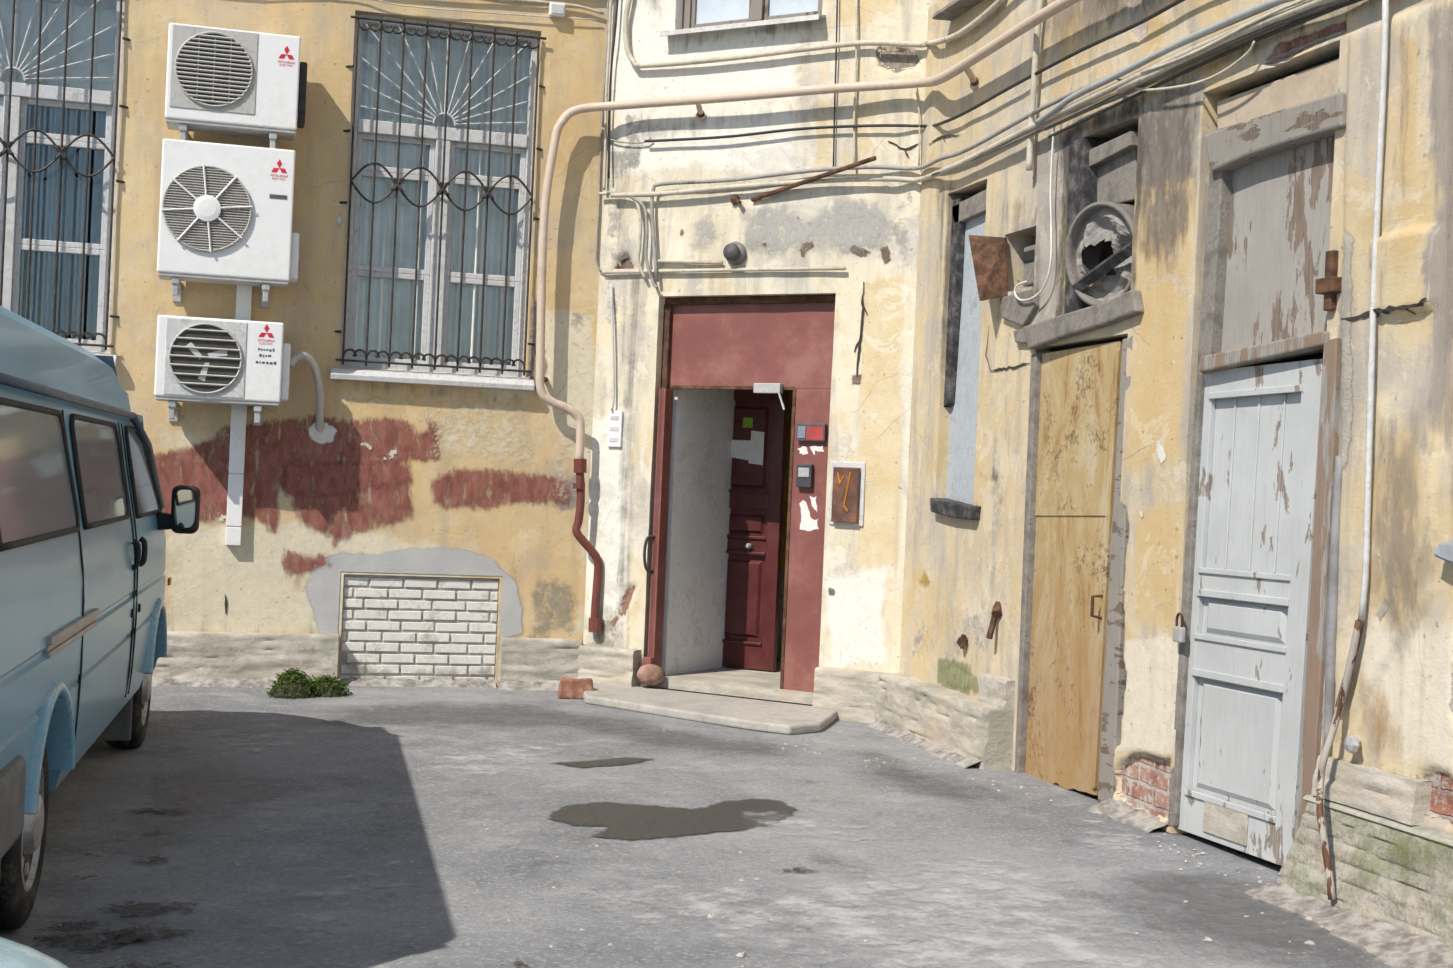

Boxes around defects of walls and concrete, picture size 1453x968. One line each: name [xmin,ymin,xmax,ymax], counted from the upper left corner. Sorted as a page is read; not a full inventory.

spalling [876,46,920,72]
damp [1427,4,1453,443]
crack [1341,297,1426,321]
peeling [1338,229,1354,468]
peeling [281,422,413,574]
peeling [431,469,570,509]
flaking render [1113,753,1171,825]
flaking render [1417,772,1453,824]